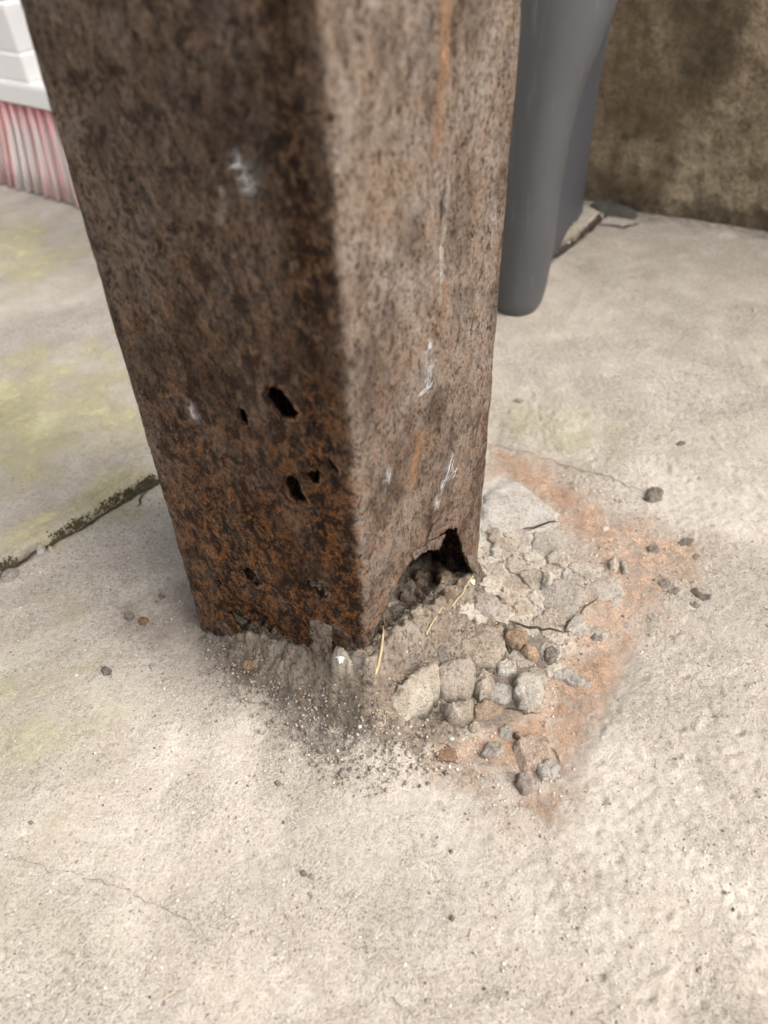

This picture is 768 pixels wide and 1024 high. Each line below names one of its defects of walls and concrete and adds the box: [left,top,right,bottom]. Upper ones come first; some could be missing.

rust [410,534,446,560]
rust [212,618,234,638]
rust [309,618,371,656]
rust [439,451,695,786]